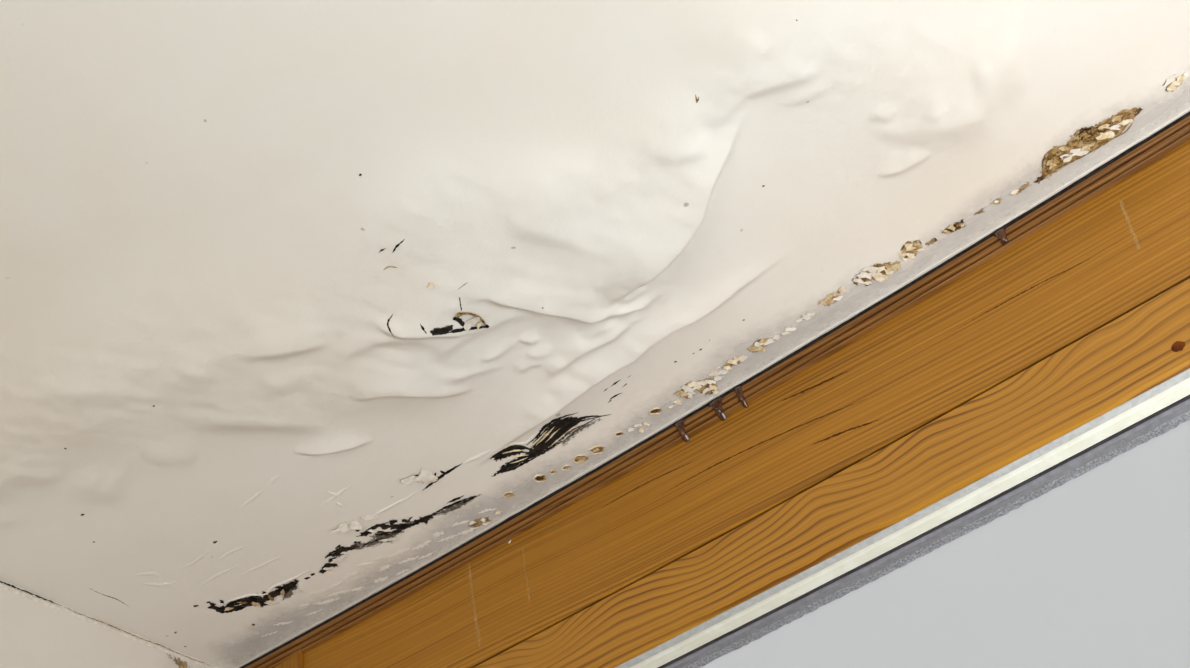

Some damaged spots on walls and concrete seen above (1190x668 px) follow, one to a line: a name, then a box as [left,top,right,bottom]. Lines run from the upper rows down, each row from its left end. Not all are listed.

flaking render [614,108,1142,437]
peeling [401,376,630,491]
leakage [420,463,581,556]